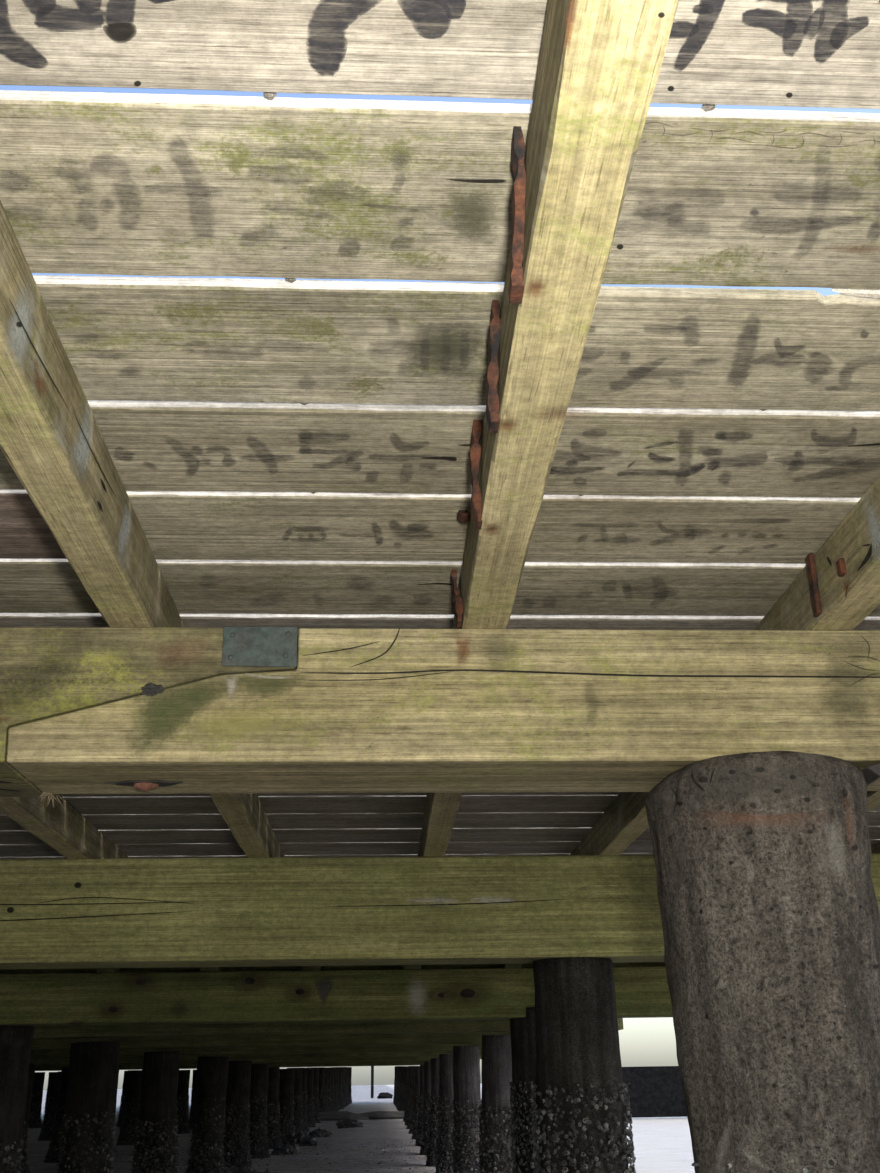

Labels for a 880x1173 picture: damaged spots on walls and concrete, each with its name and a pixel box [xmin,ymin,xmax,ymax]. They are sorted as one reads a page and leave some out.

crack [301,628,880,681]